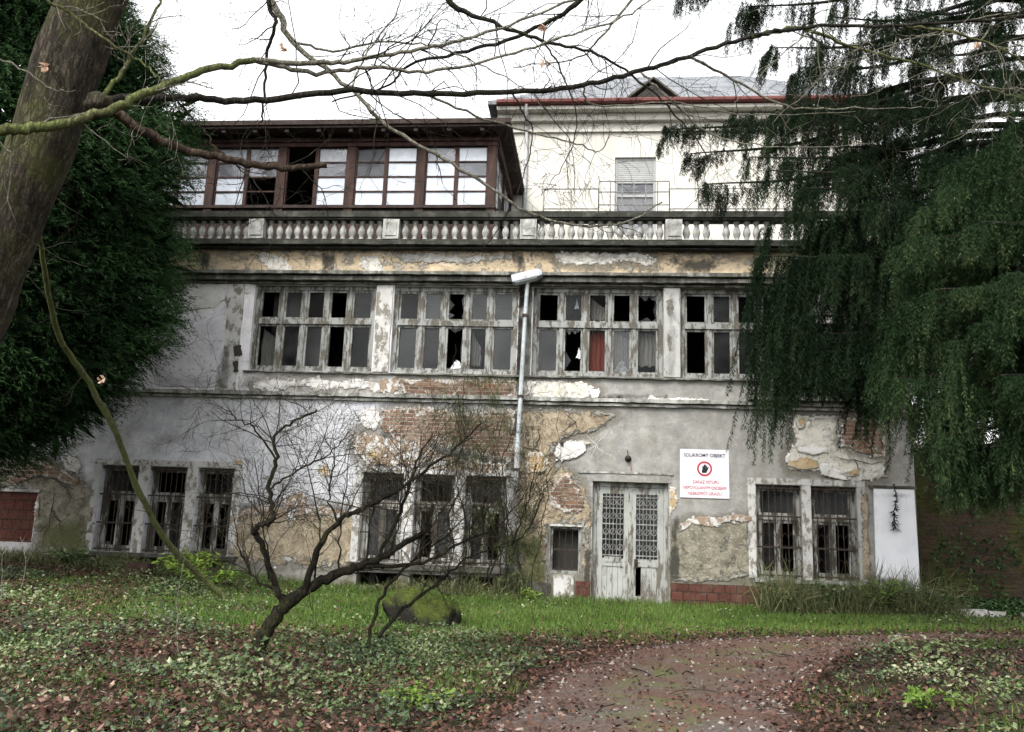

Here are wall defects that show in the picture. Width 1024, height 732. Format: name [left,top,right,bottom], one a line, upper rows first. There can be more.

peeling [359,254,386,271]
peeling [555,251,656,267]
spalling [252,374,616,583]
spalling [785,408,887,579]
spalling [671,512,751,584]